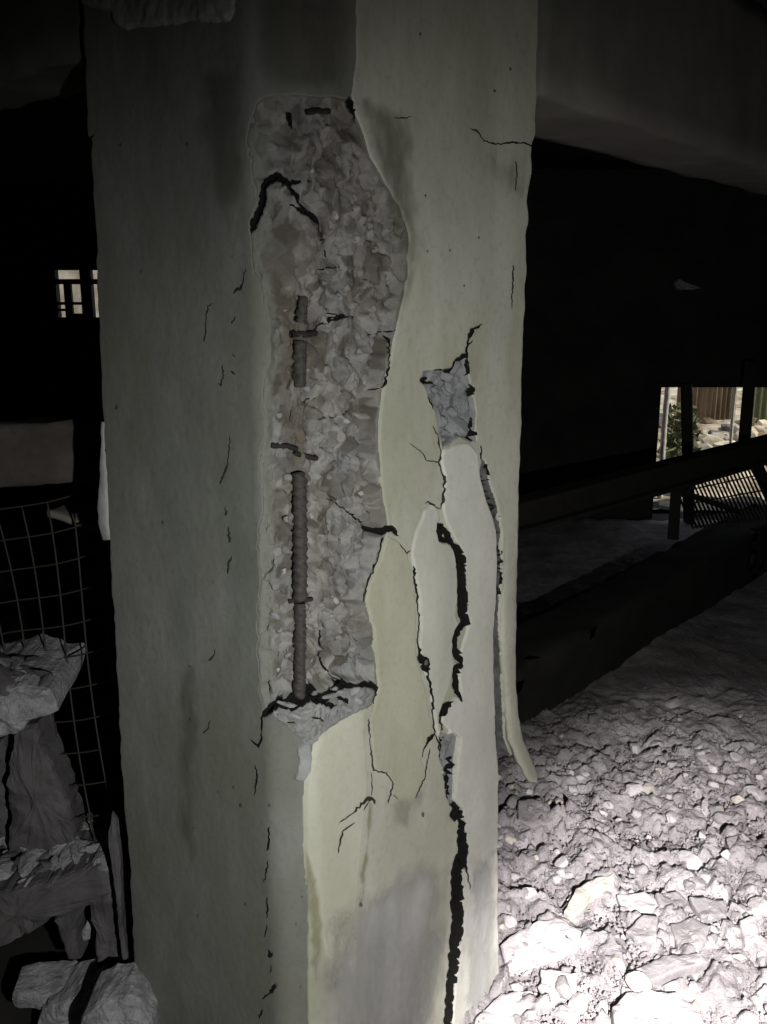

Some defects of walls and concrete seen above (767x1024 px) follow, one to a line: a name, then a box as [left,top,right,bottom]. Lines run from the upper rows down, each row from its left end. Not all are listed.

crack [470,128,532,191]
crack [250,172,340,271]
crack [508,266,516,306]
spalling [420,359,476,446]
spalling [247,95,459,963]
crack [251,324,503,1024]